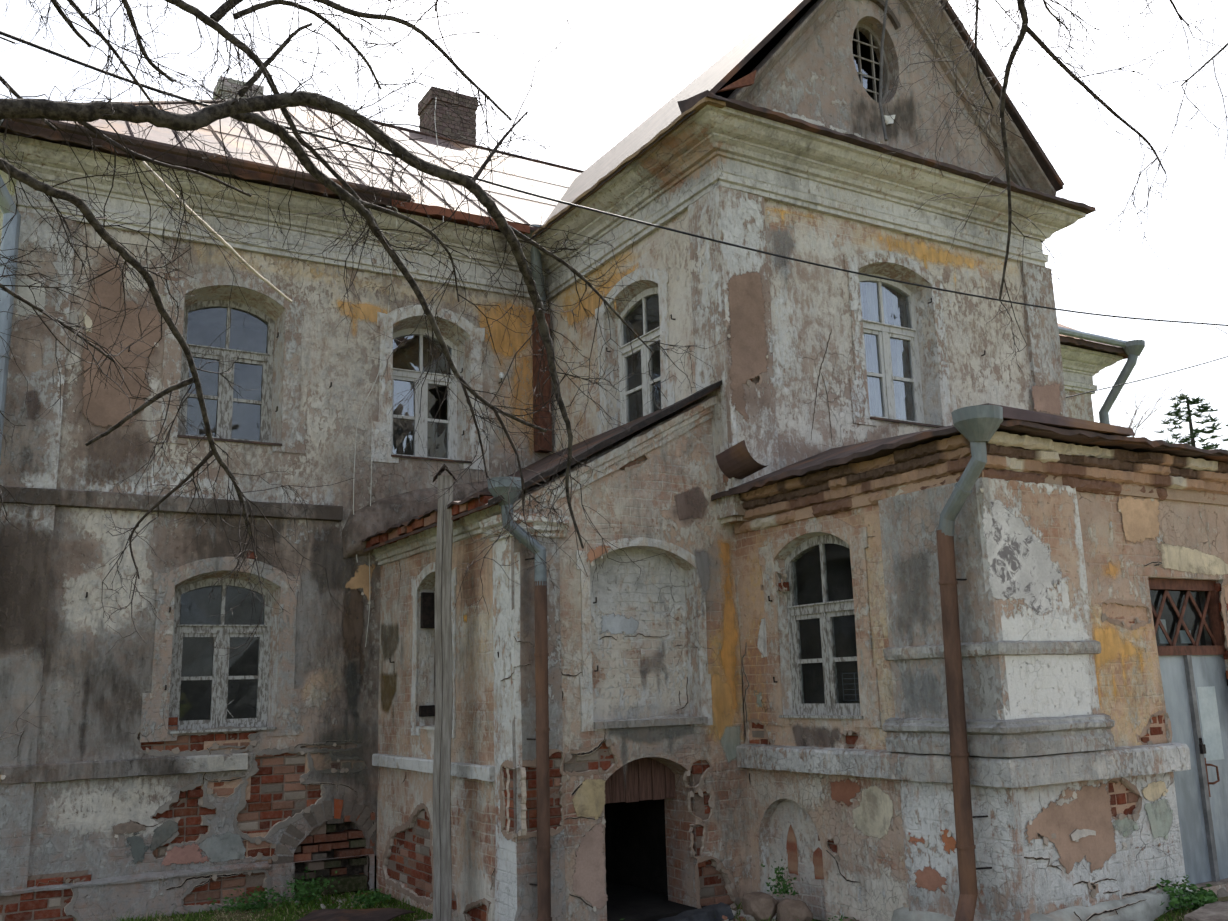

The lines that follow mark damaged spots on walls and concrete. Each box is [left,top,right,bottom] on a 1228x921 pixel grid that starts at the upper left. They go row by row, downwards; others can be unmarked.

peeling [81,258,161,427]
peeling [726,271,769,421]
water stain [0,523,51,647]
peeling [979,488,1062,615]
peeling [1117,496,1228,679]
flaking render [1136,710,1172,745]
flaking render [0,870,91,921]
flaking render [113,717,368,912]
flaking render [382,803,434,906]
flaking render [451,889,491,921]
flaking render [499,739,618,842]
peeling [1024,777,1161,898]